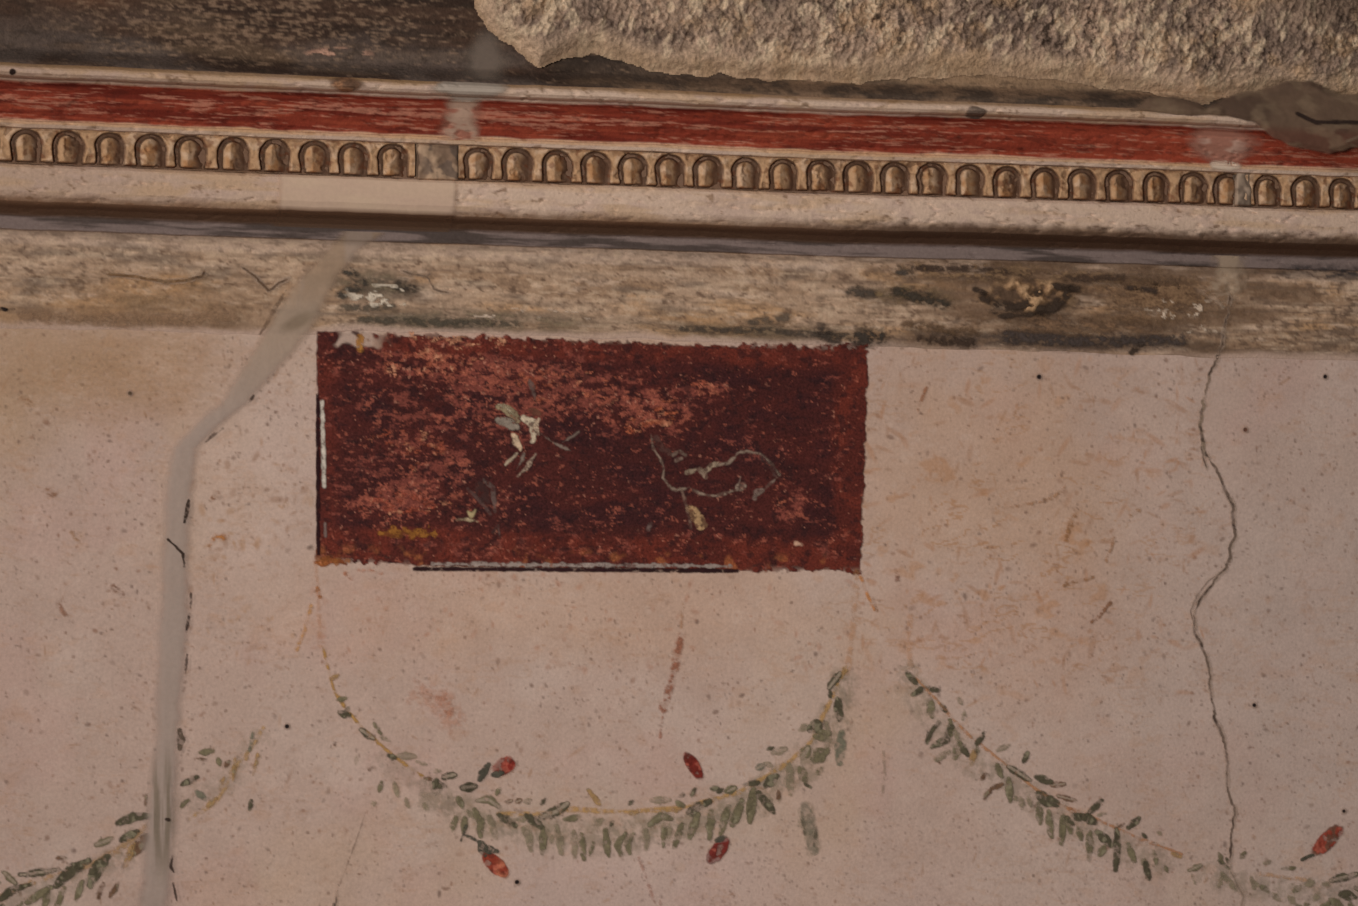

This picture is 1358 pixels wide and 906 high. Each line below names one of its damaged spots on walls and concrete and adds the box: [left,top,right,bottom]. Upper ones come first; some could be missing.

flaking render [474,0,1358,105]
crack [1191,295,1237,859]